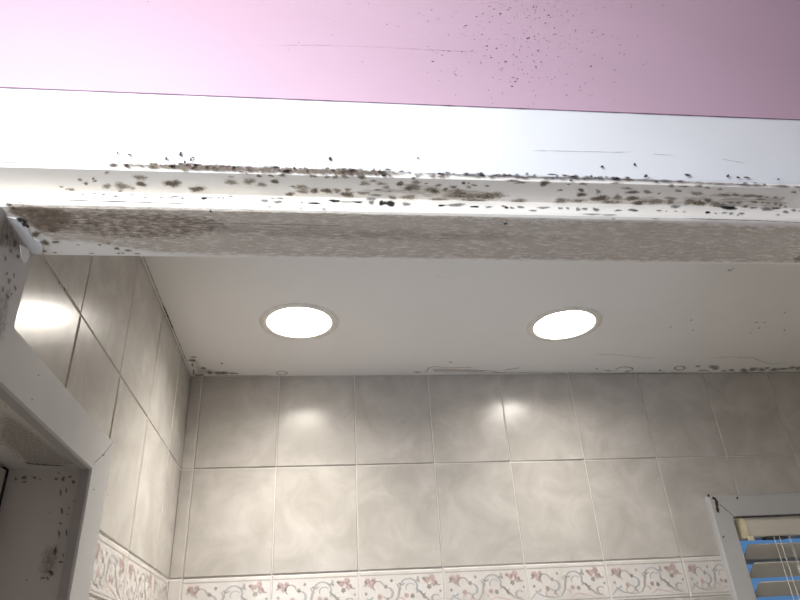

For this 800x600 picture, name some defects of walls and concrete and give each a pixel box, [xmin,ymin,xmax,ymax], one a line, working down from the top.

water stain [0,151,800,376]